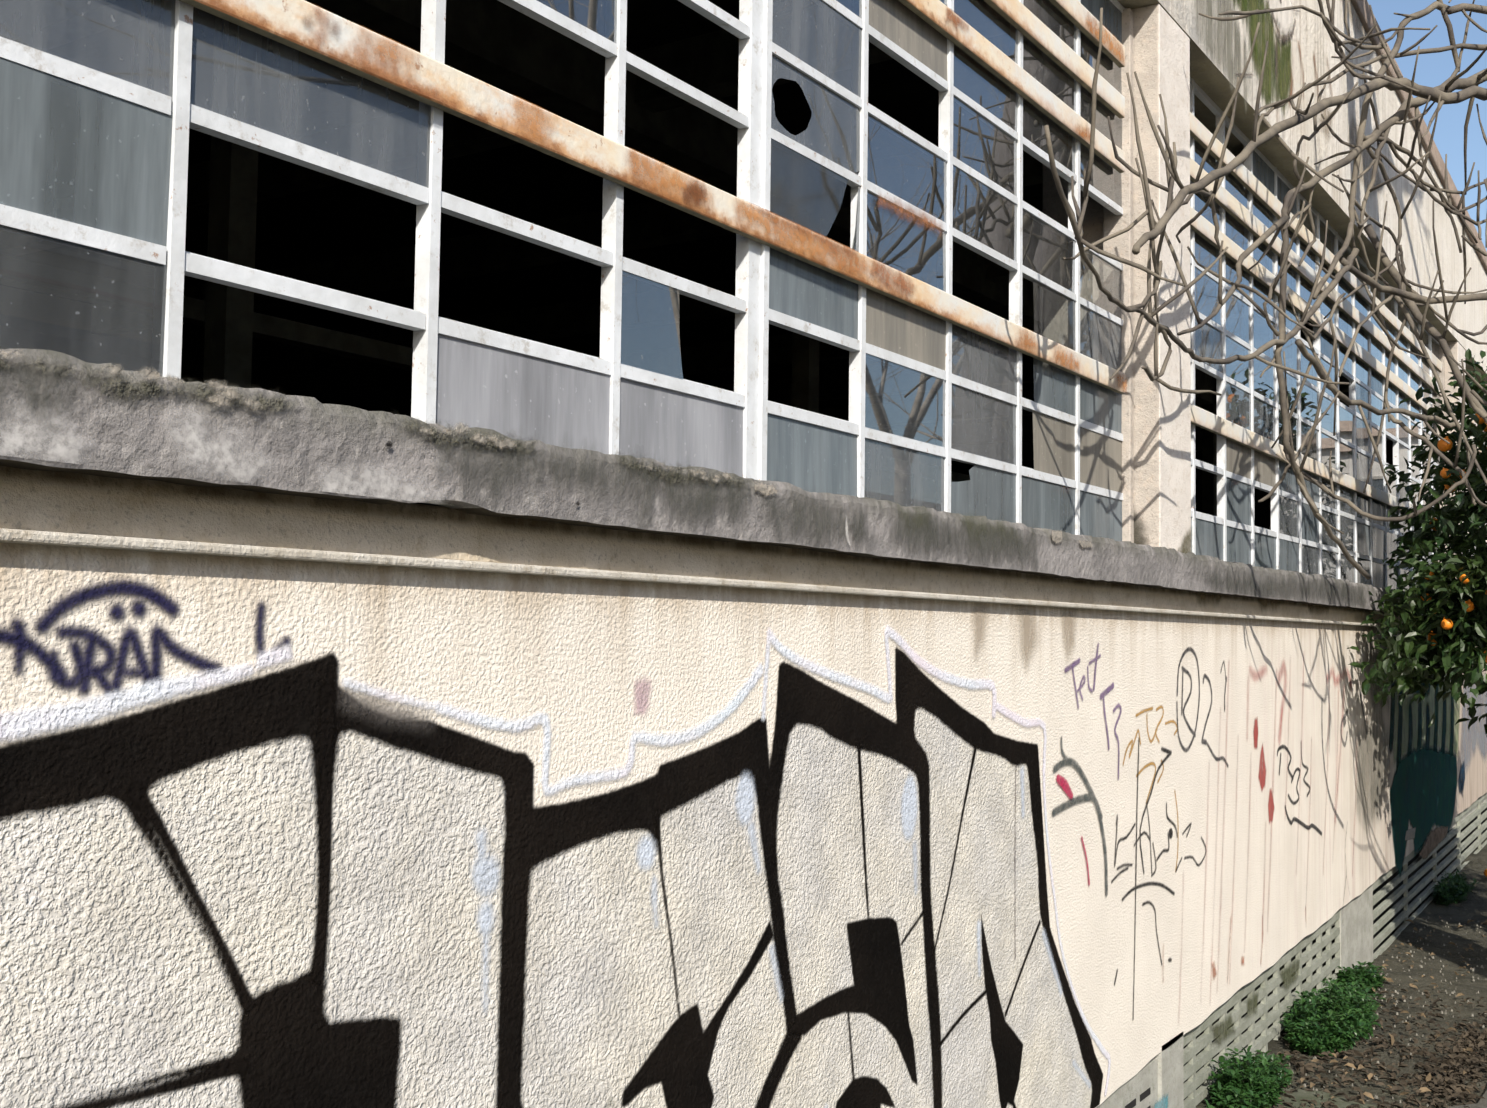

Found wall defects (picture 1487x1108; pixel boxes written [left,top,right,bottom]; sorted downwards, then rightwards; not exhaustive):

corrosion [946,8,962,29]
corrosion [364,39,440,101]
corrosion [1087,20,1123,61]
water stain [1196,0,1247,103]
corrosion [517,99,544,138]
corrosion [630,149,708,209]
corrosion [879,197,936,227]
corrosion [738,203,913,294]
corrosion [1056,351,1079,369]